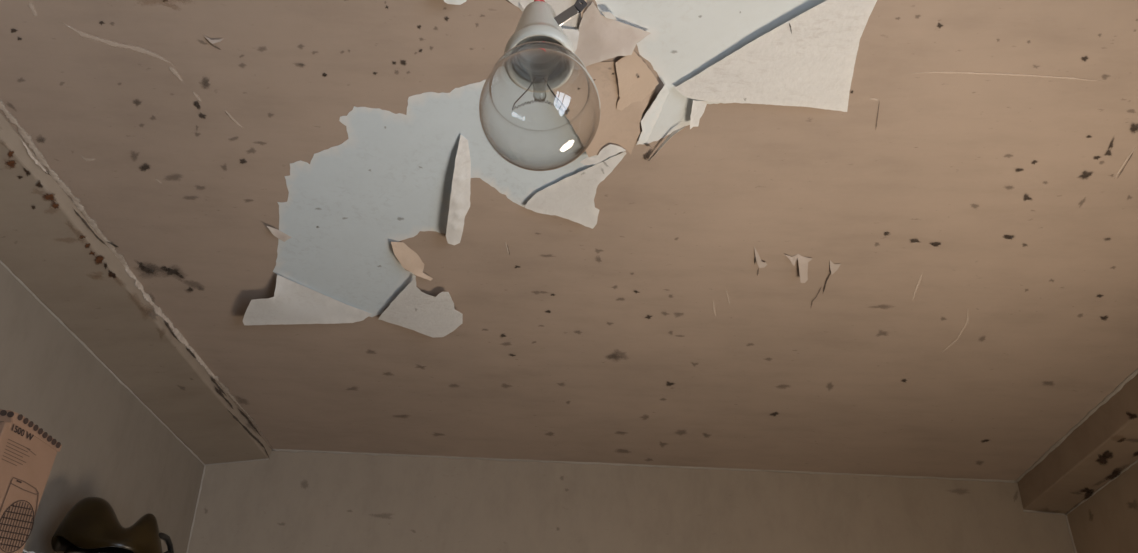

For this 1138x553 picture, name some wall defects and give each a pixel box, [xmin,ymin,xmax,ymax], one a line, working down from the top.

leakage [139,263,193,291]
peeling [243,0,877,338]